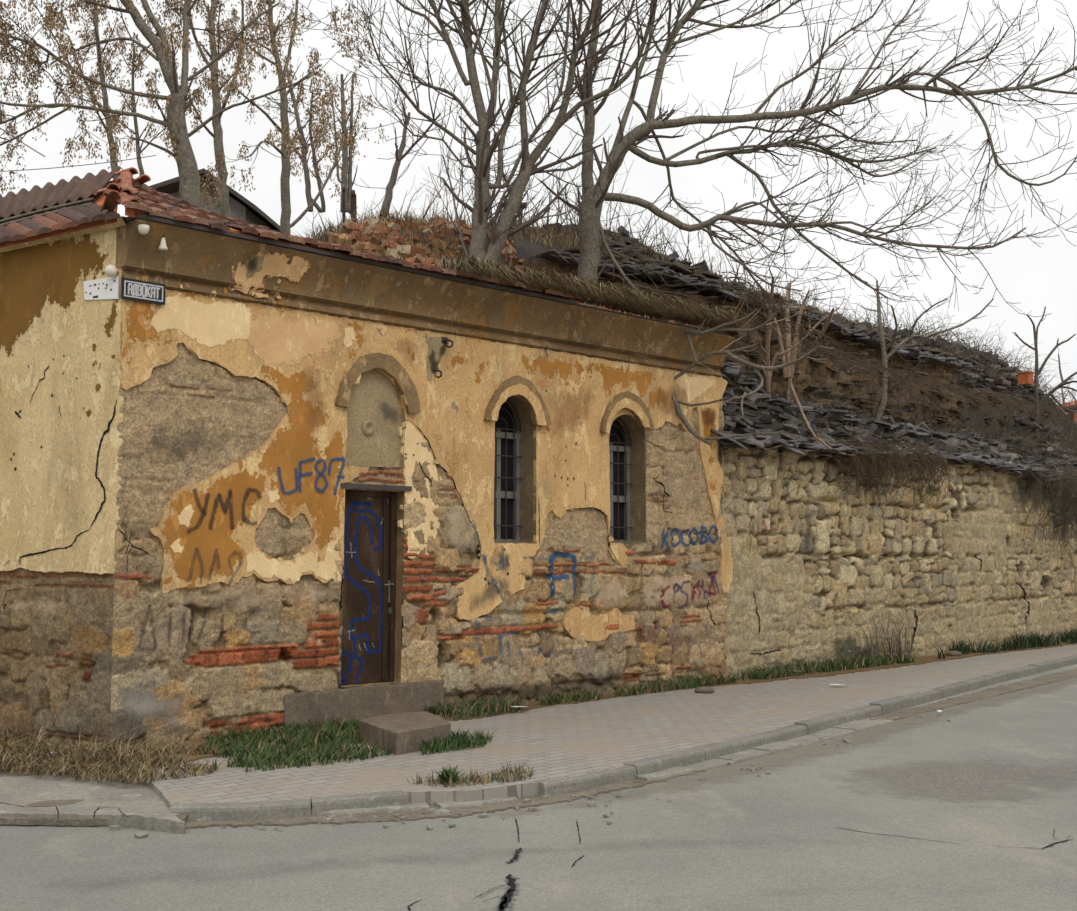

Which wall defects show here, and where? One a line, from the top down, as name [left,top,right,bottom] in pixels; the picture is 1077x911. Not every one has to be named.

peeling [0,233,108,357]
crack [3,399,150,610]
spalling [104,251,373,590]
spalling [397,420,500,593]
spalling [536,503,614,562]
spalling [521,355,719,552]
crack [910,609,918,651]
crack [1020,585,1030,629]